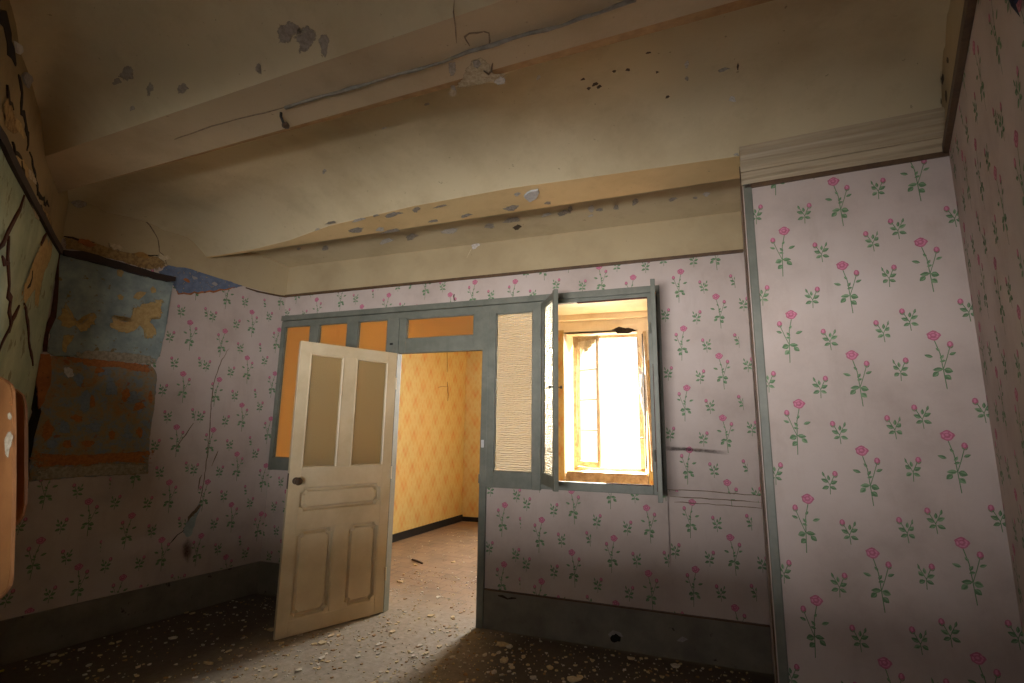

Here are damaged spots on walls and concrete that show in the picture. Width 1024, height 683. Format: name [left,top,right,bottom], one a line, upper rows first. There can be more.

peeling [277,21,329,57]
crack [0,9,60,486]
peeling [2,84,242,482]
peeling [348,207,420,244]
peeling [484,189,573,230]
crack [175,351,227,504]